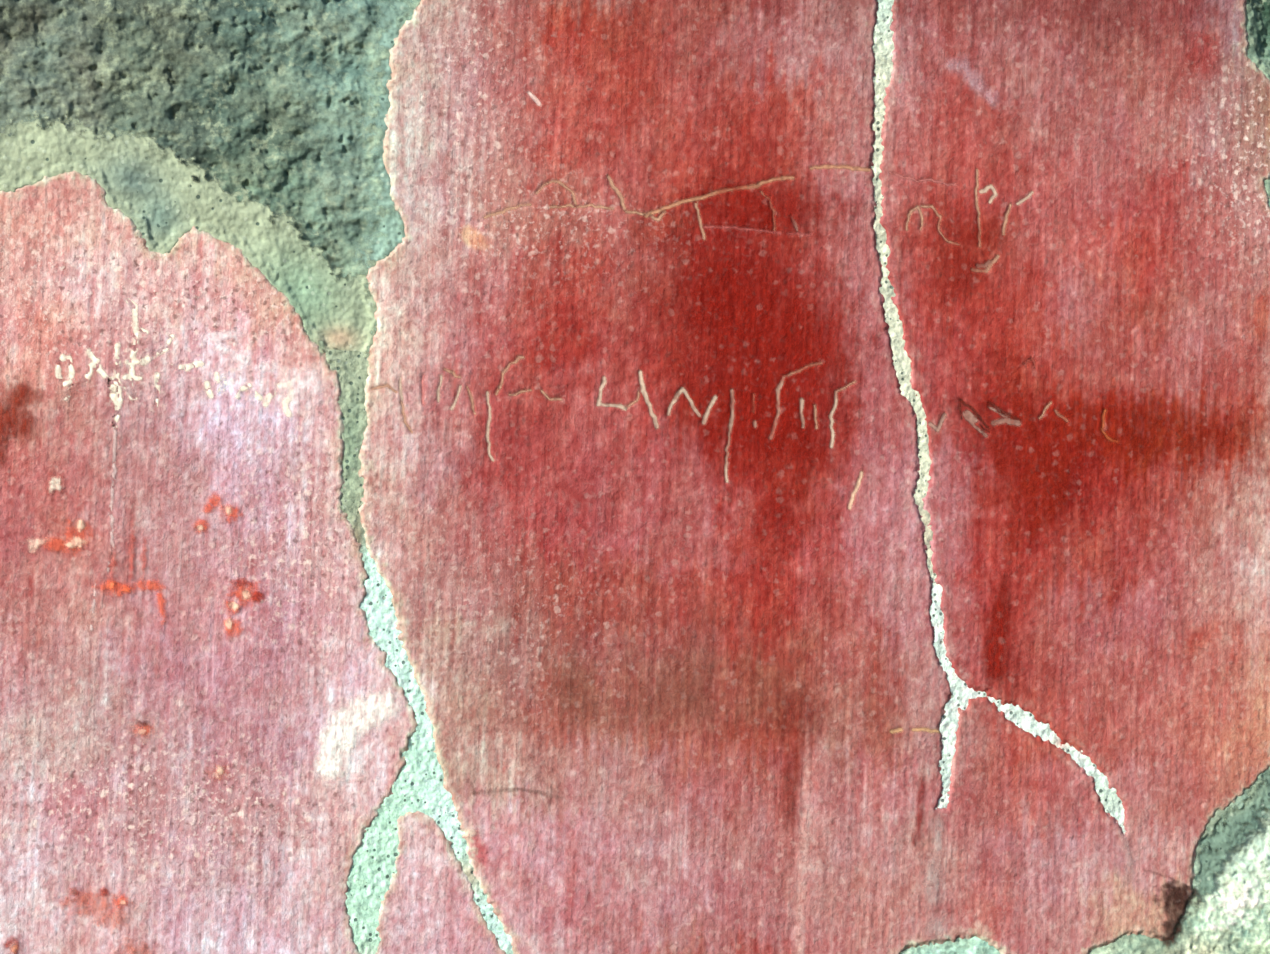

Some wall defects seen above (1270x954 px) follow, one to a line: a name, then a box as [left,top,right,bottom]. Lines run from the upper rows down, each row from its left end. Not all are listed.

spalling [0,0,421,362]
crack [871,0,1126,835]
peeling [30,520,86,552]
peeling [195,495,238,532]
spalling [900,936,1000,954]
spalling [1089,766,1270,954]